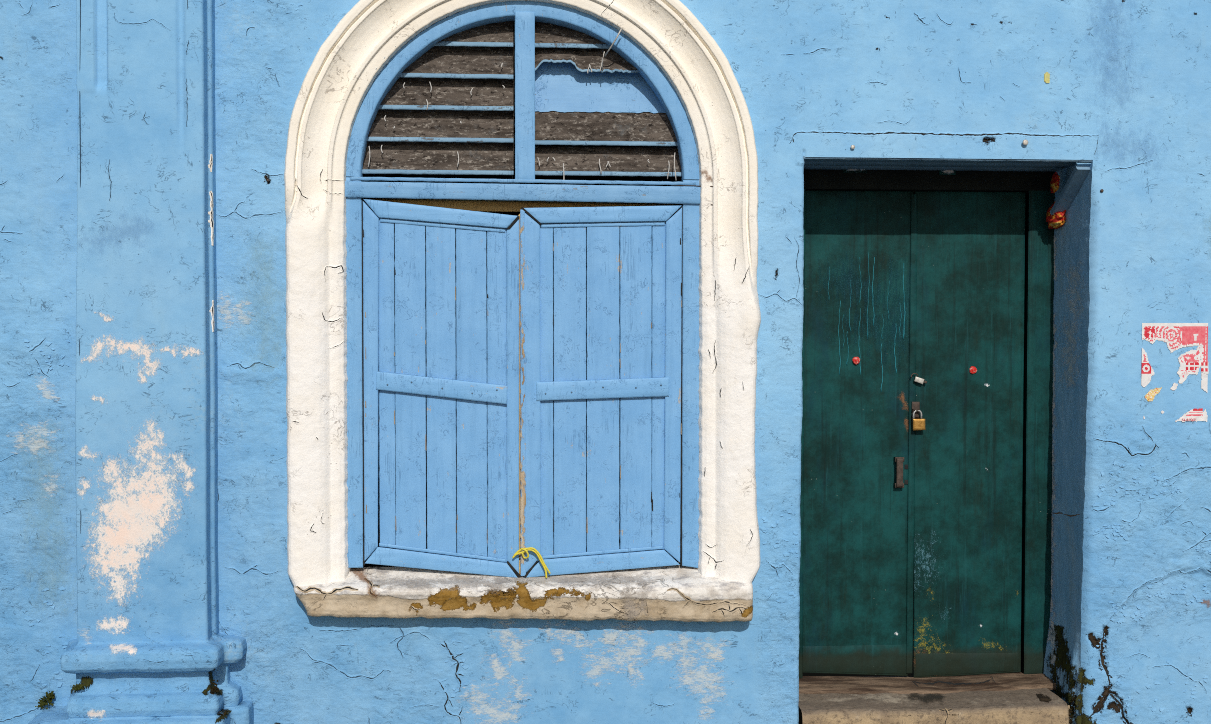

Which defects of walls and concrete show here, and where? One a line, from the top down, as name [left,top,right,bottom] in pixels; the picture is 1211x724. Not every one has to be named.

peeling [81,311,201,383]
peeling [35,419,196,694]
crack [225,564,466,724]
spalling [409,581,592,616]
crack [1052,425,1211,724]